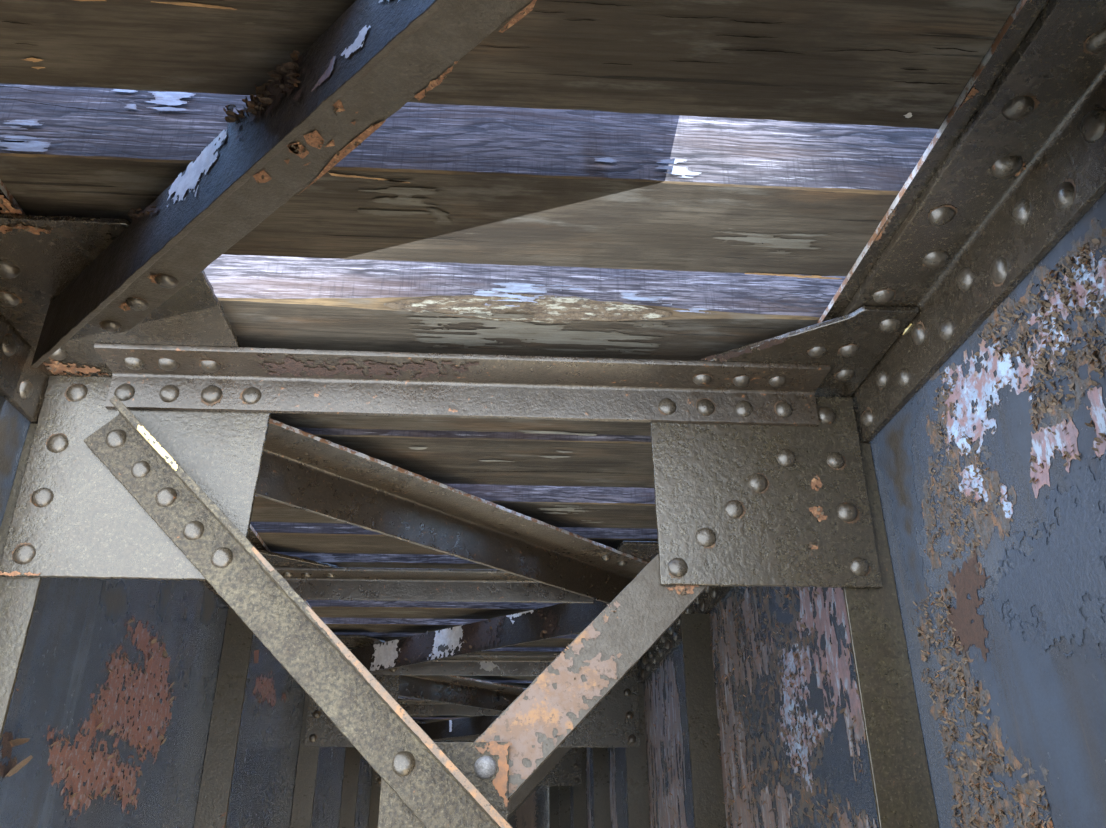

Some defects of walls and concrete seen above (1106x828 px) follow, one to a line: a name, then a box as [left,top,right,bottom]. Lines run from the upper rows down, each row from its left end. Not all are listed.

peeling [167,51,301,207]
peeling [311,25,371,92]
corrosion [251,546,274,572]
peeling [911,217,1106,828]
peeling [0,729,33,778]
peeling [43,616,176,821]
peeling [370,640,400,671]
peeling [413,625,473,661]
corrosion [306,601,632,828]
peeling [644,657,688,828]
peeling [708,586,879,828]